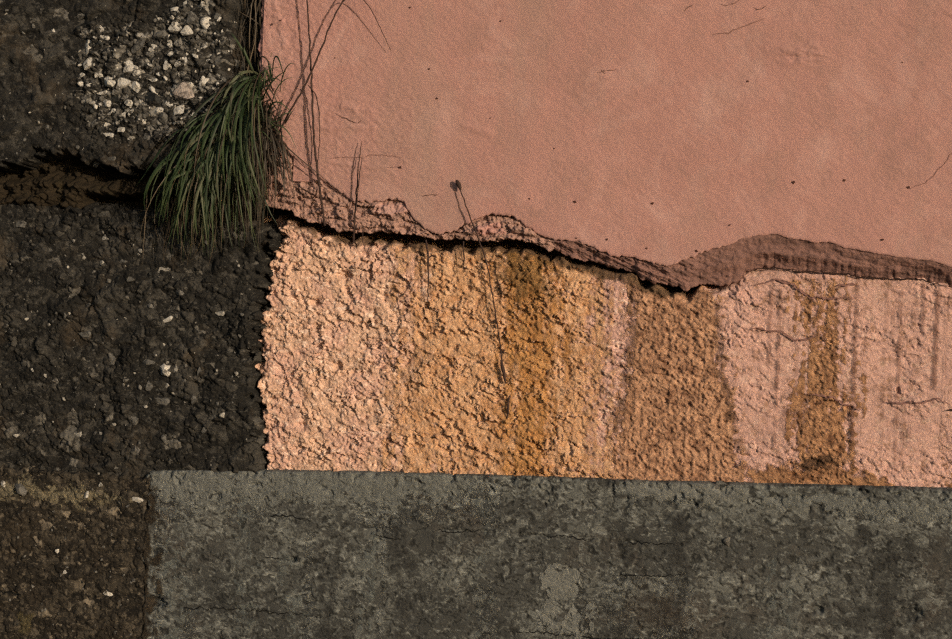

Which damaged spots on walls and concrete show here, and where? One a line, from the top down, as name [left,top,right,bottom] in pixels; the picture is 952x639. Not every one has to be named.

peeling [265,139,952,482]
leakage [933,293,946,386]